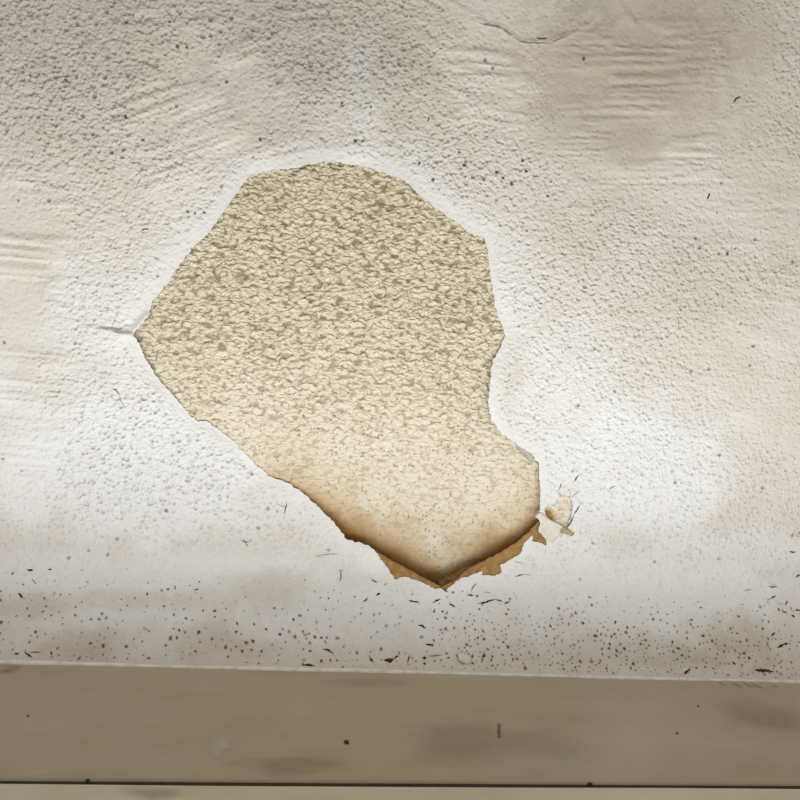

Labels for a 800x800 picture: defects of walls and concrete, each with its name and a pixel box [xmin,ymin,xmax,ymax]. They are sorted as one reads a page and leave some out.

peeling [134,161,574,617]